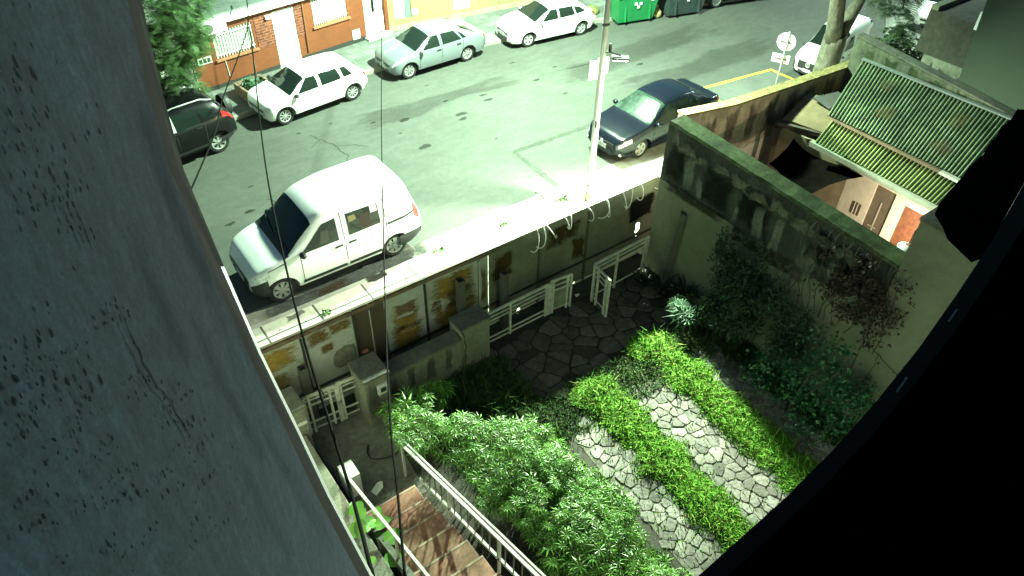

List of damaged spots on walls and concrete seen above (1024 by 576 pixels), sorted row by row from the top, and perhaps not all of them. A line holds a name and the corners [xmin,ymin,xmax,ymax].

corrosion [547,219,585,259]
corrosion [392,252,512,353]
crack [124,318,187,431]